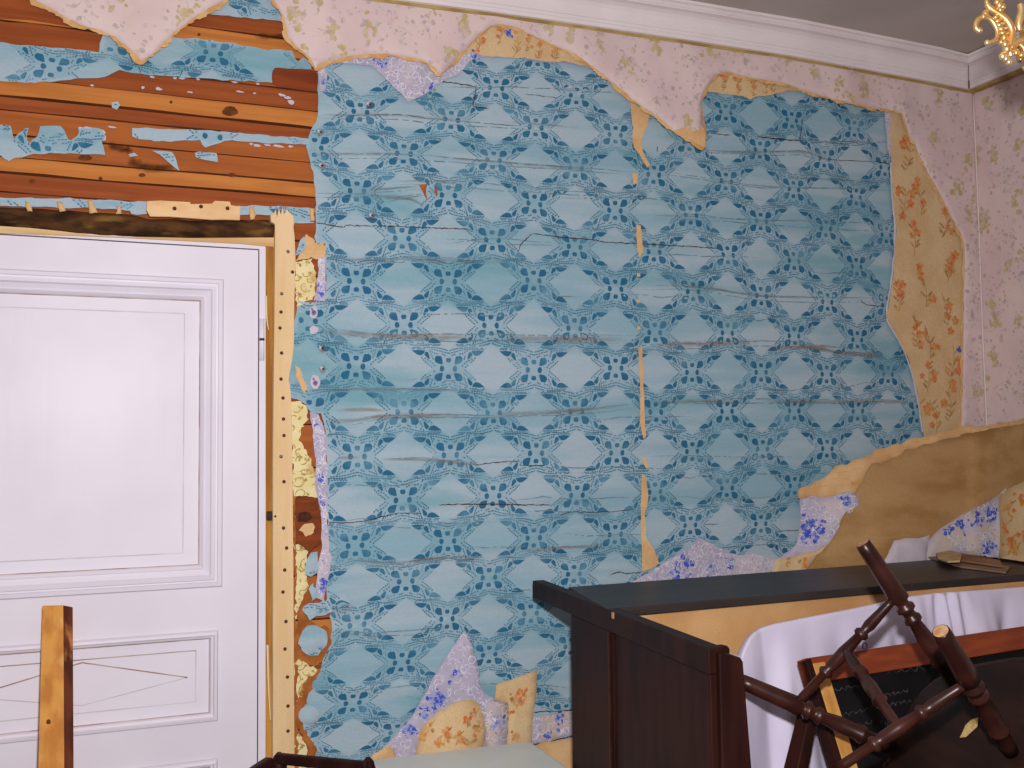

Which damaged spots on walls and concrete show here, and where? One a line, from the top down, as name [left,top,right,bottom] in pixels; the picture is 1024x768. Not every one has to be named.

crack [318,222,468,230]
crack [518,233,718,252]
peeling [299,523,315,537]